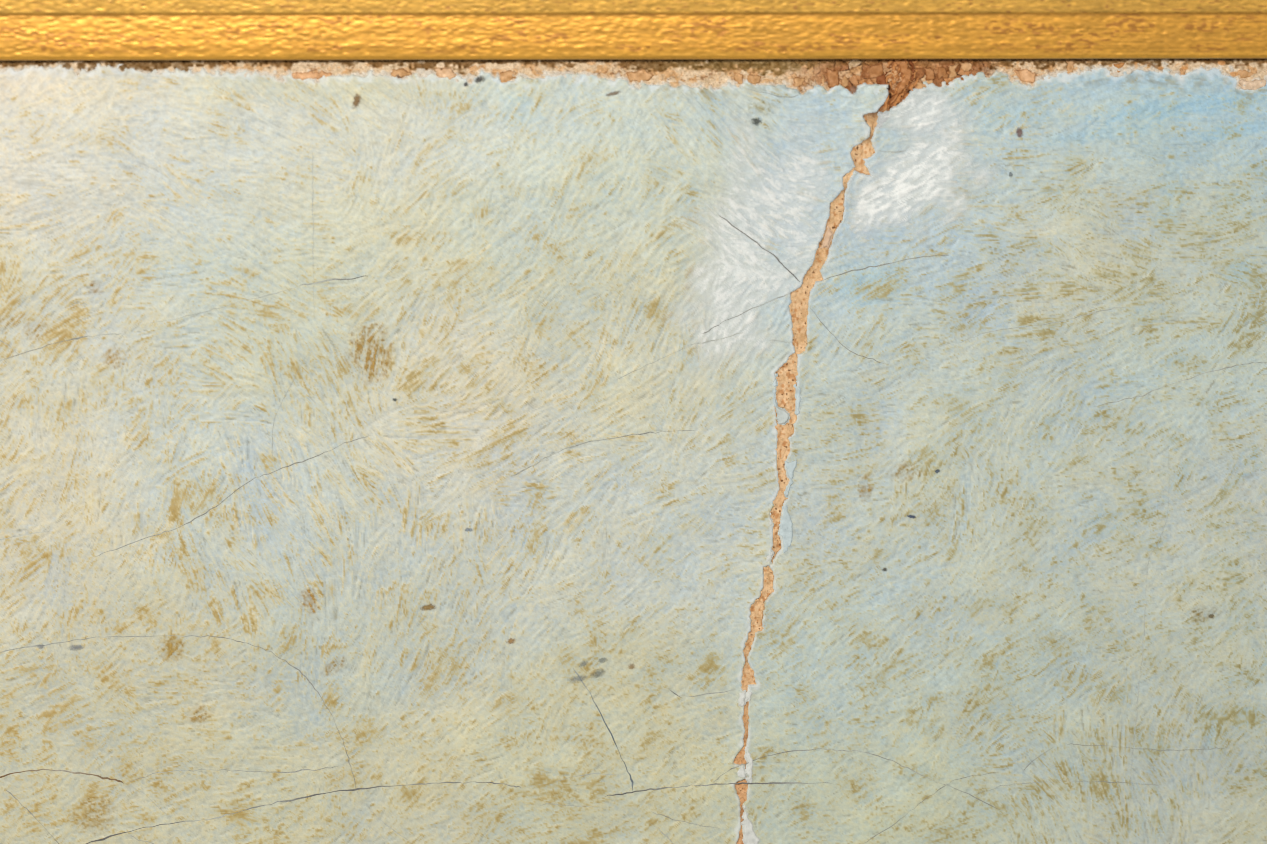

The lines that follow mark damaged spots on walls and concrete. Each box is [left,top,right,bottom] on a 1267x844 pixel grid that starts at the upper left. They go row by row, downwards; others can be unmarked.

peeling [0,59,1267,105]
crack [0,153,364,361]
crack [96,362,367,557]
crack [513,59,1158,844]
crack [1099,362,1267,406]
crack [0,635,521,844]